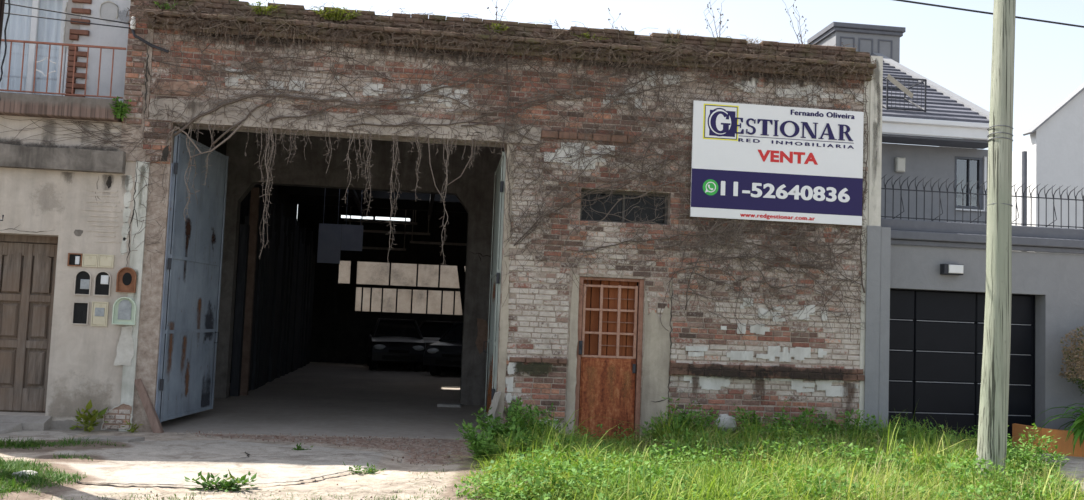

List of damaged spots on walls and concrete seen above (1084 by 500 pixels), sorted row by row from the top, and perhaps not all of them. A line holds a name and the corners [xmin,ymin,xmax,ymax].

peeling [544,142,615,170]
rust [168,323,189,397]
rust [198,298,214,341]
peeling [505,356,518,403]
peeling [685,346,708,357]
peeling [683,375,730,390]
peeling [720,298,828,362]
peeling [754,377,858,397]